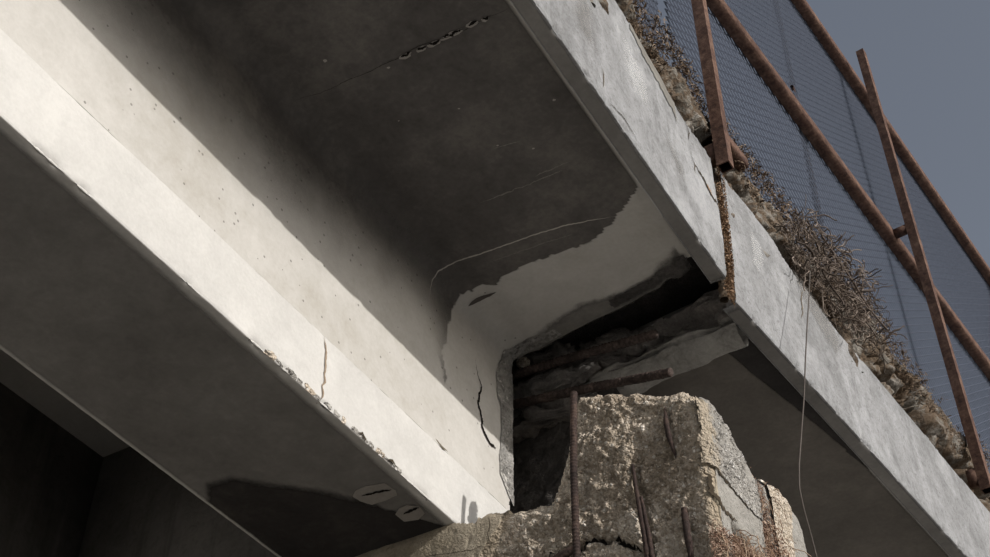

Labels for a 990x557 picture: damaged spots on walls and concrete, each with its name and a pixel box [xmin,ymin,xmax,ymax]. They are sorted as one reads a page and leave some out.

water stain [124,0,723,359]
spalling [609,255,692,308]
spalling [263,349,402,473]
crack [476,365,496,449]
spalling [480,289,796,557]
peeling [353,483,398,505]
peeling [395,505,425,522]
crack [427,518,502,557]
crack [549,536,642,557]